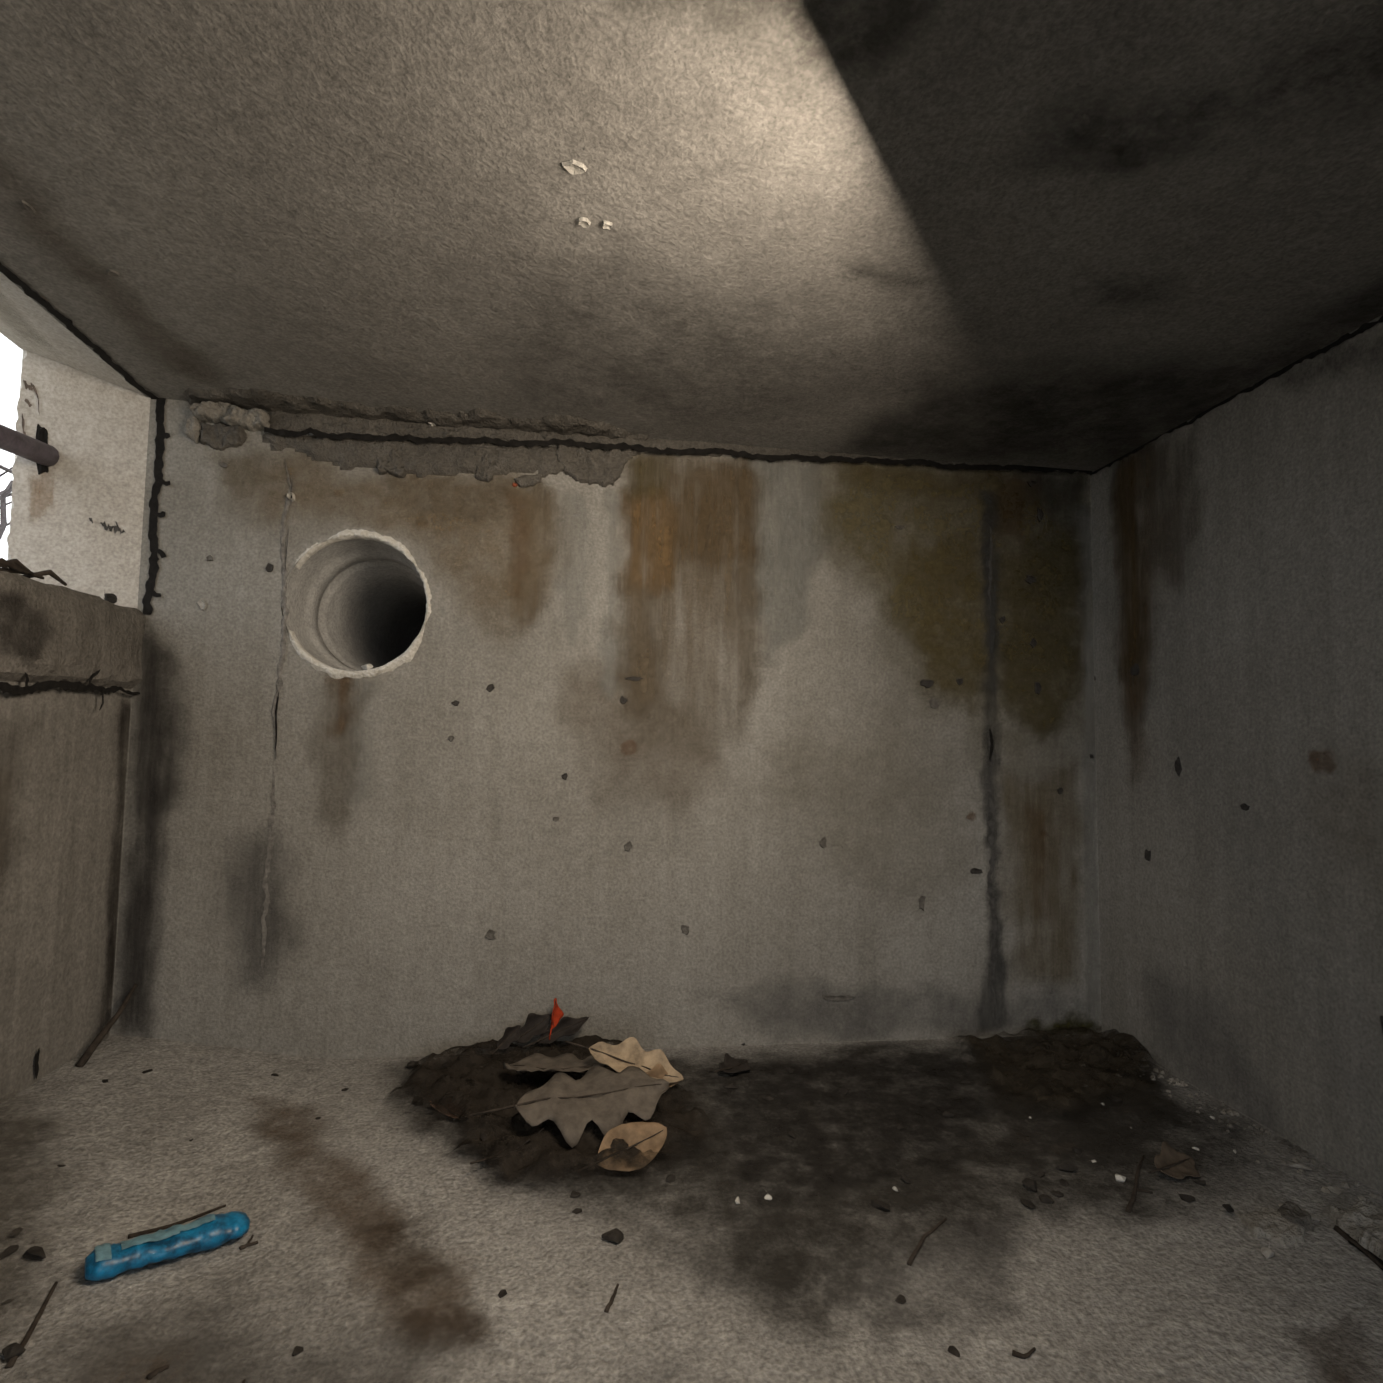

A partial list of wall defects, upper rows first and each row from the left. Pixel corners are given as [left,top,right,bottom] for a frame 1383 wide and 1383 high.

spalling [185,388,650,478]
crack [0,669,140,711]
crack [273,693,281,749]